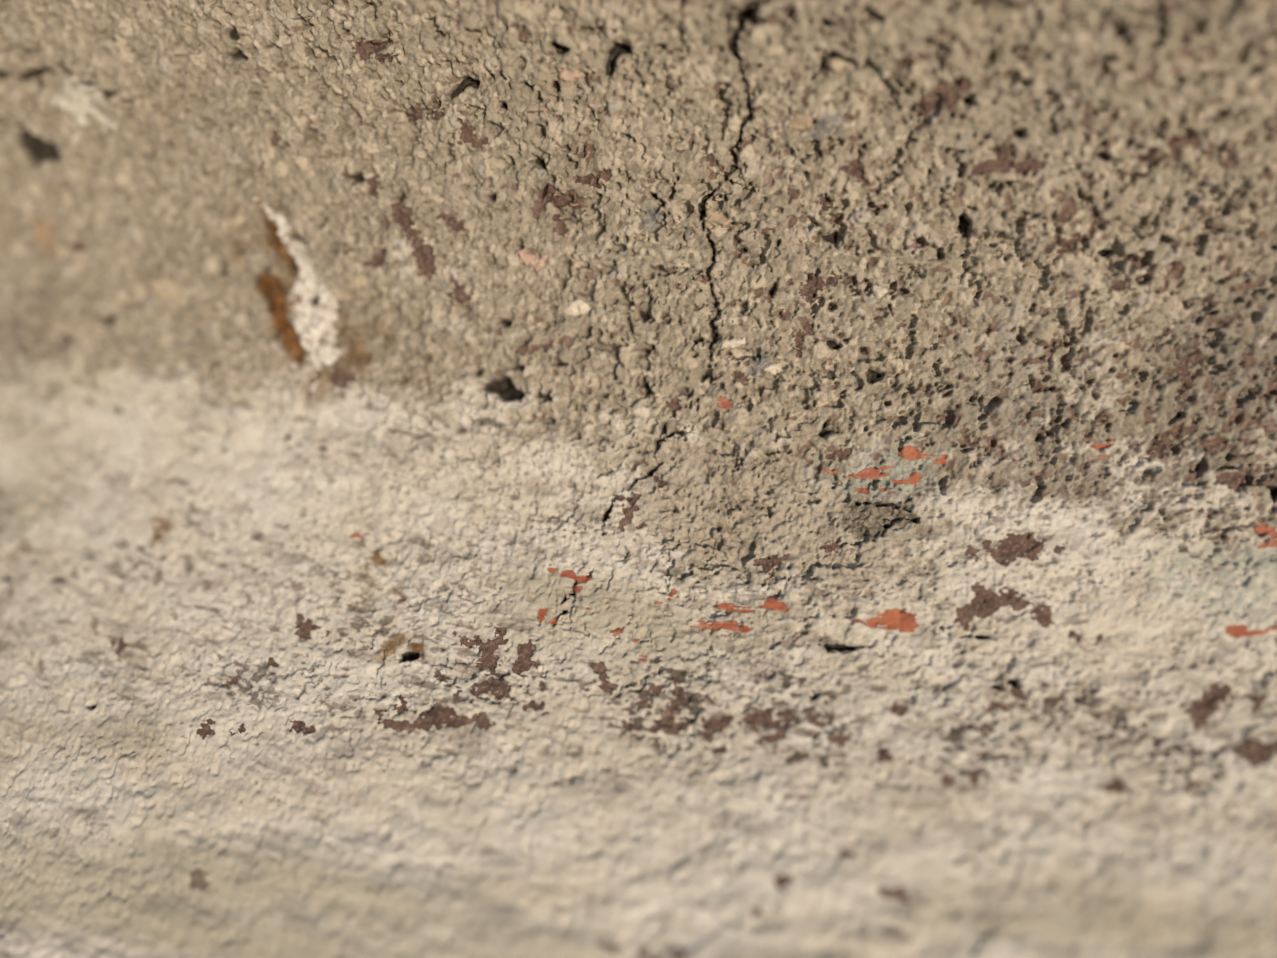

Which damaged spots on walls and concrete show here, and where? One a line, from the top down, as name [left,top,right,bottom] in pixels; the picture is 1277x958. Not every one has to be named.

crack [0,63,132,102]
crack [694,0,768,368]
corrosion [253,200,369,383]
crack [602,425,685,535]
peeling [965,532,1065,567]
peeling [295,613,330,641]
peeling [686,597,788,633]
spalling [823,644,857,652]
peeling [955,582,1054,639]
peeling [373,626,536,734]
peeling [621,676,848,755]
peeling [1179,682,1266,732]